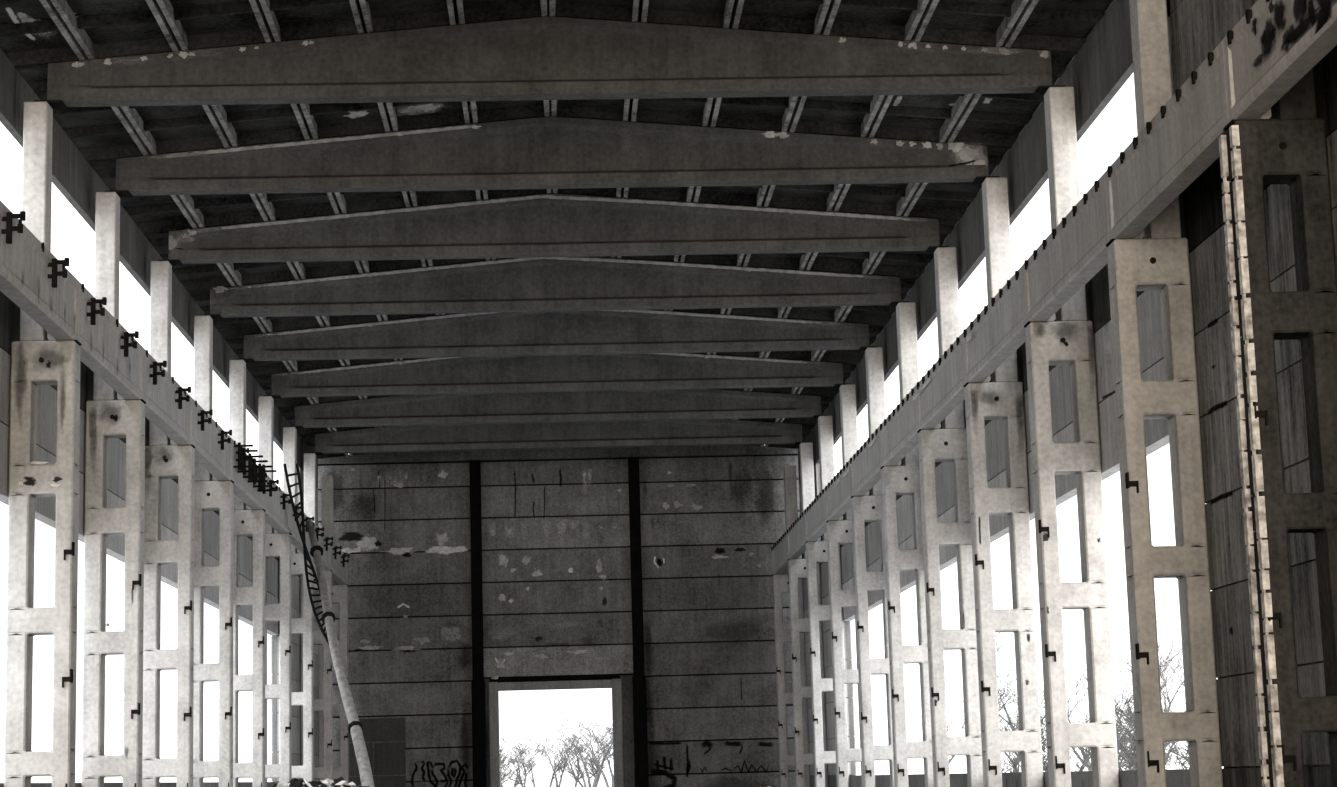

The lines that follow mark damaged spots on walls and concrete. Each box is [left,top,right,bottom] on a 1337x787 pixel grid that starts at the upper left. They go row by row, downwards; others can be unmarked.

spalling [338,532,468,557]
peeling [499,554,543,591]
peeling [596,558,607,605]